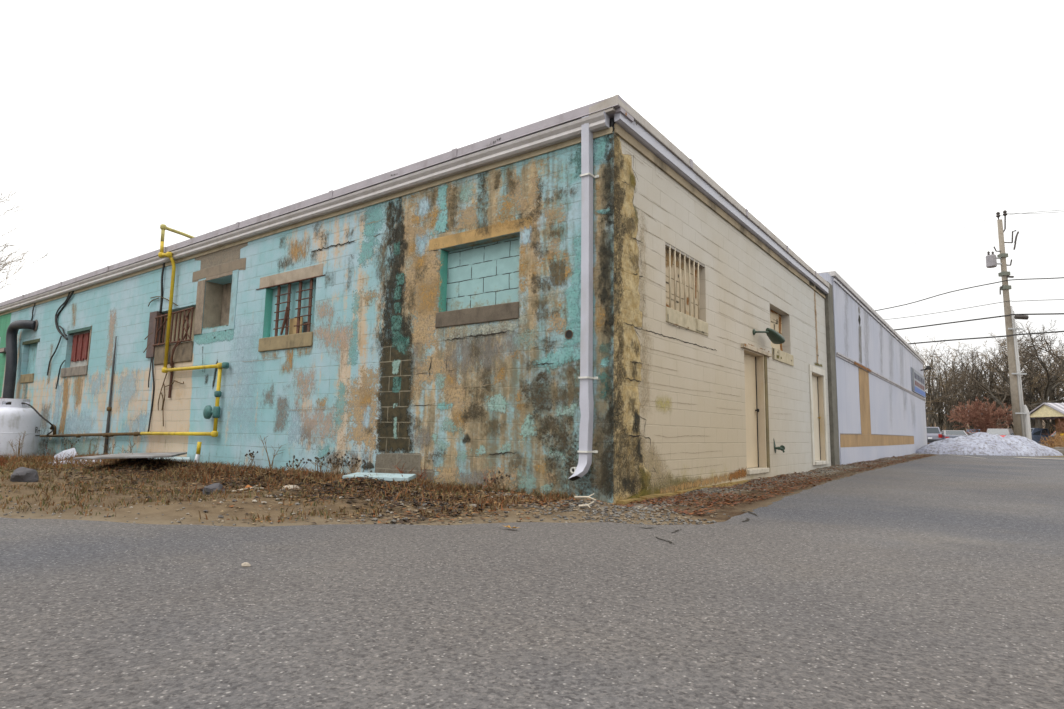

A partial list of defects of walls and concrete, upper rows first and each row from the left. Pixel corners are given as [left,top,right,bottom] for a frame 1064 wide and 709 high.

peeling [46,384,99,456]
peeling [288,290,381,458]
peeling [357,204,386,265]
leakage [327,195,445,481]
leakage [446,172,515,233]
peeling [403,183,571,494]
leakage [441,184,574,435]
peeling [493,160,581,373]
peeling [556,403,578,417]
leakage [520,135,622,499]
flaking render [571,135,651,504]